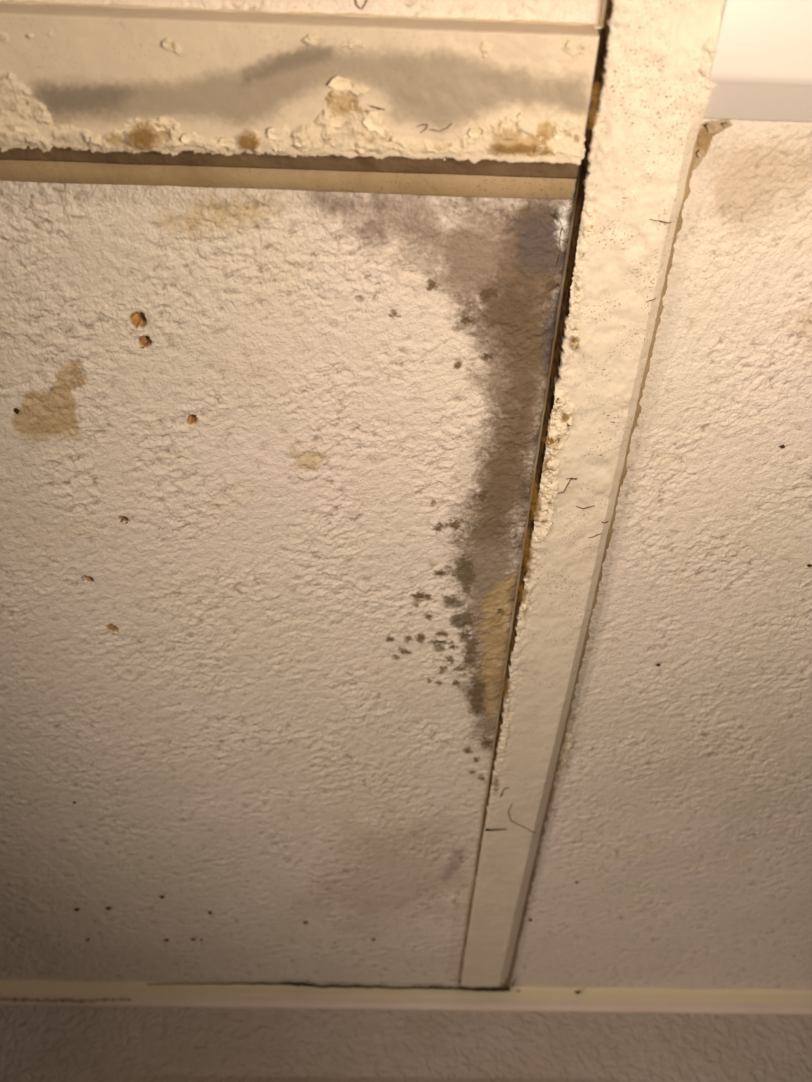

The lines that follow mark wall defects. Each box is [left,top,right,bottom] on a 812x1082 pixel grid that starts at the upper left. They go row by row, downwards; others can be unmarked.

peeling [0,70,585,160]
water stain [15,362,84,432]
crack [147,0,613,992]
water stain [387,201,571,780]
flaking render [533,386,575,543]